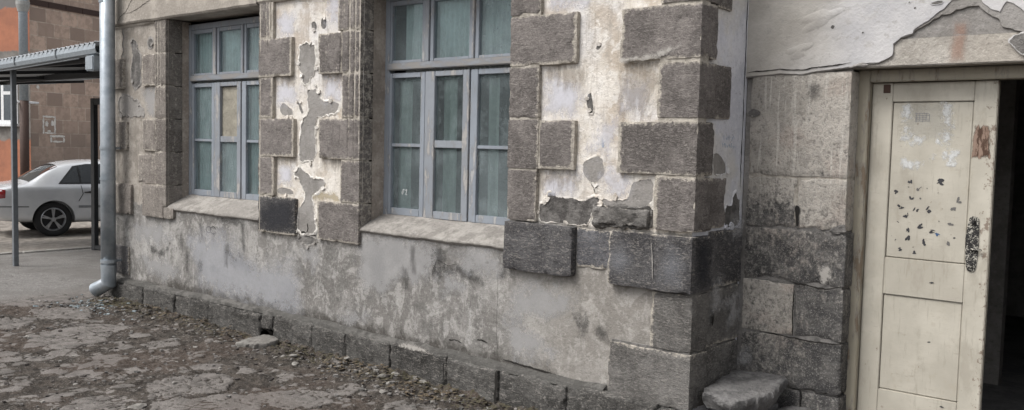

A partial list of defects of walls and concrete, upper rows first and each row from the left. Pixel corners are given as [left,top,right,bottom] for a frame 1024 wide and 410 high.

flaking render [903,1,1024,55]
peeling [277,16,341,250]
damp [261,202,291,231]
peeling [537,152,655,230]
peeling [724,189,741,230]
damp [359,238,505,293]